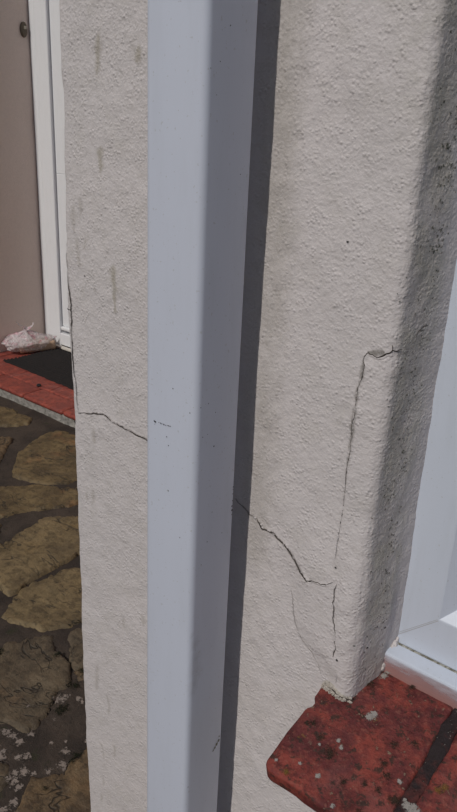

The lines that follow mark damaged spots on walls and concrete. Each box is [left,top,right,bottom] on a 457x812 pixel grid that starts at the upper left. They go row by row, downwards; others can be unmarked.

crack [66,264,147,441]
crack [335,325,428,555]
crack [240,504,337,655]